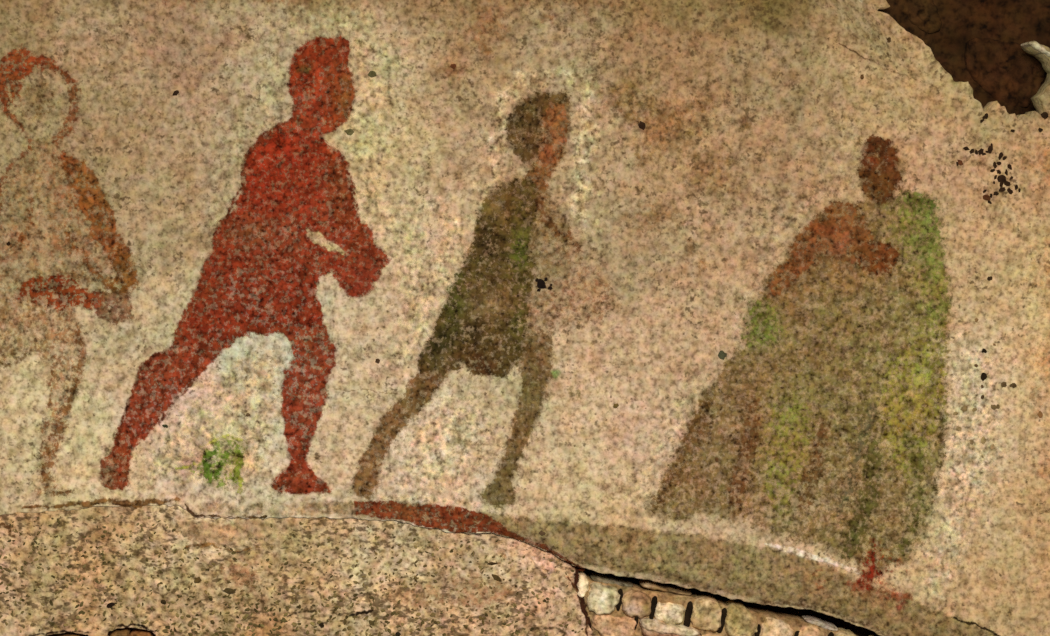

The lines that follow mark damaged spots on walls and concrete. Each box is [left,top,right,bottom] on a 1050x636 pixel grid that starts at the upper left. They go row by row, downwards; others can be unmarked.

flaking render [877,0,1050,132]
water stain [163,358,269,484]
crack [0,497,260,537]
crack [186,542,260,552]
peeling [531,551,570,577]
crack [350,608,373,616]
crack [544,566,593,636]
spalling [576,568,880,636]
crack [29,623,156,636]
flaking render [108,627,155,636]
crack [954,617,1000,636]